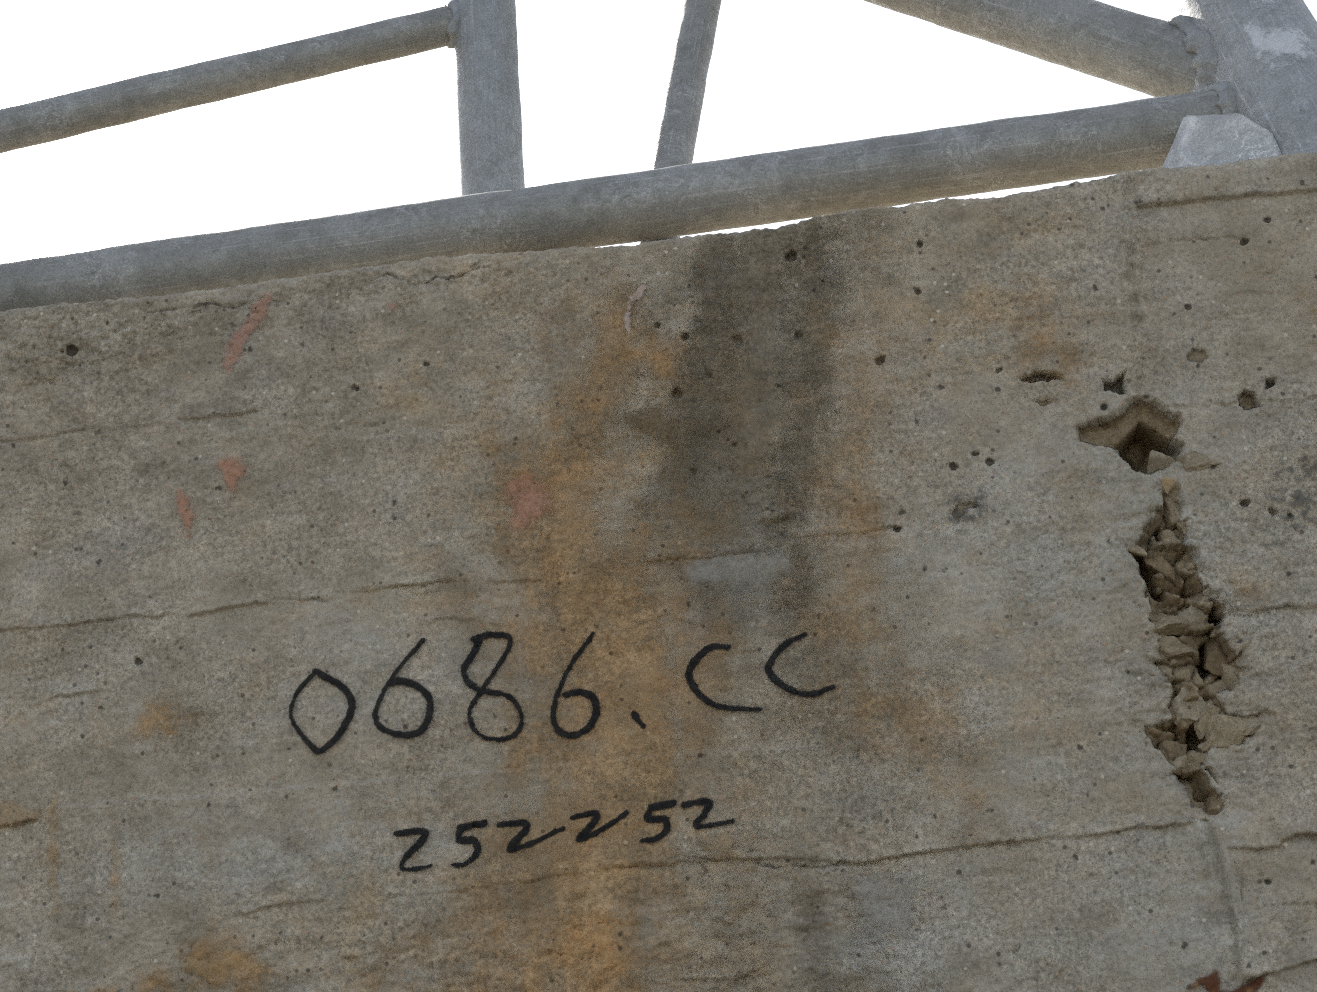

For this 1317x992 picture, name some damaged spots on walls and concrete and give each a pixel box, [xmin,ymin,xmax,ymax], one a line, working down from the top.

water stain [625,220,830,613]
rust [454,296,704,992]
rust [1192,971,1265,992]